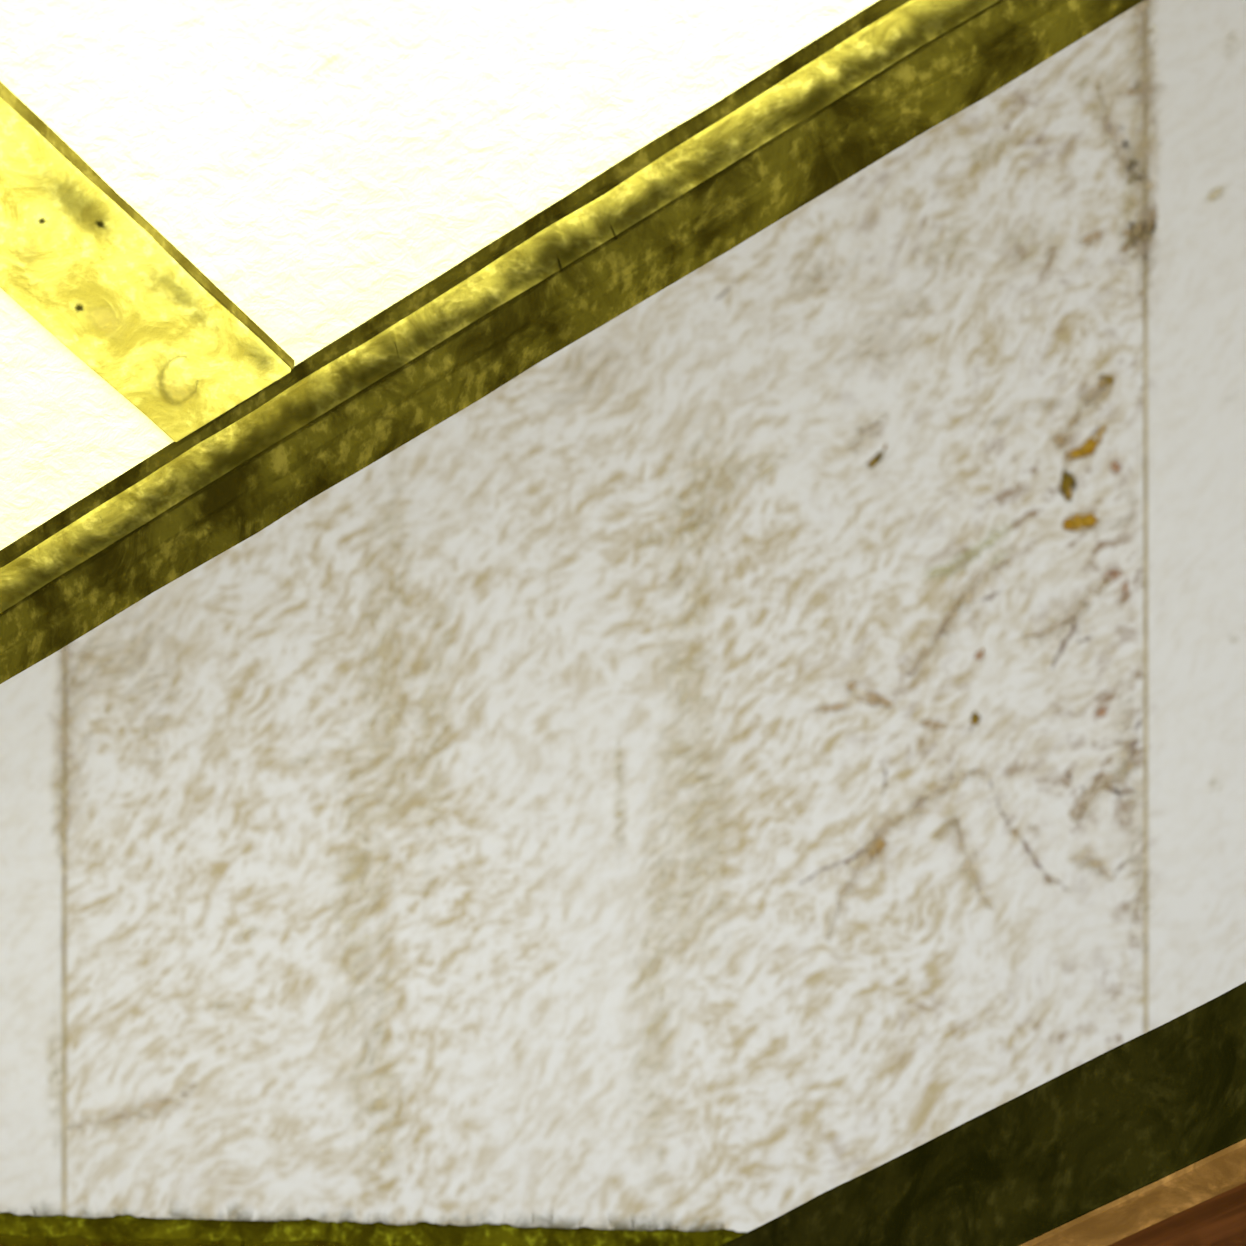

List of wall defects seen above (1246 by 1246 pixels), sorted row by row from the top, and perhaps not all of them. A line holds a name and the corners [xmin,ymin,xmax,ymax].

rust [1055,418,1106,460]
rust [1063,513,1098,531]